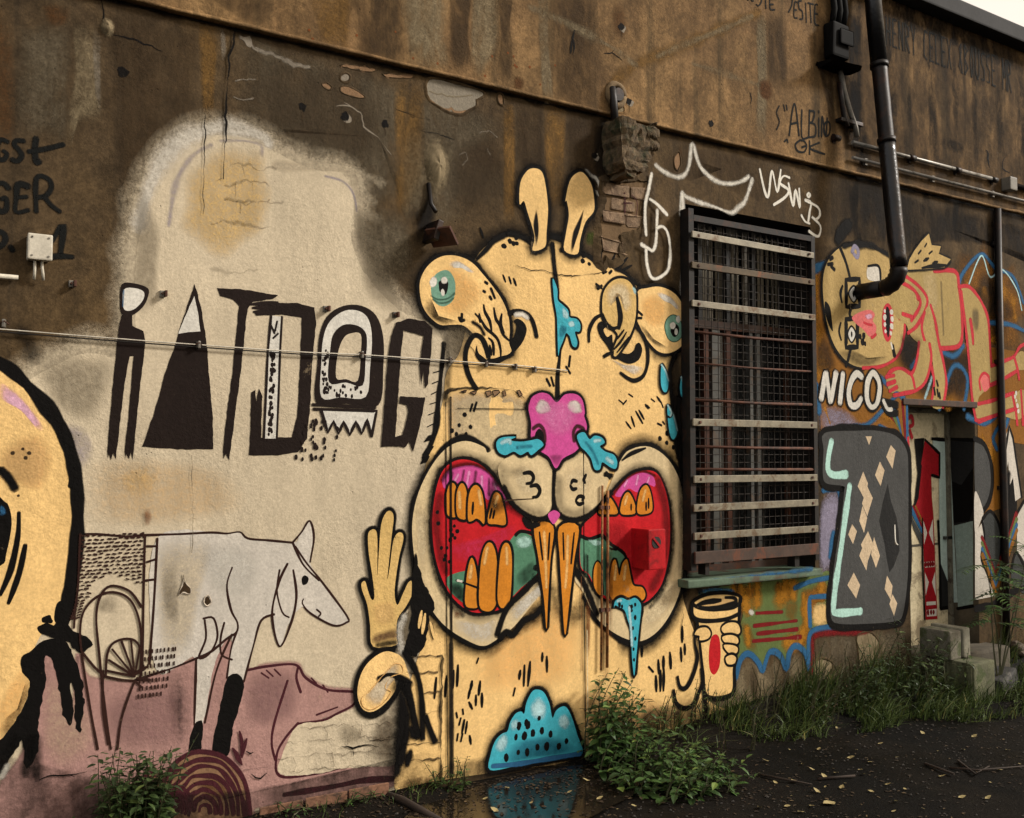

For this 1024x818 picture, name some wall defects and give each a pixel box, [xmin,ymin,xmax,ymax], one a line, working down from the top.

crack [202,27,237,213]
spalling [339,64,505,117]
flaking render [591,172,656,273]